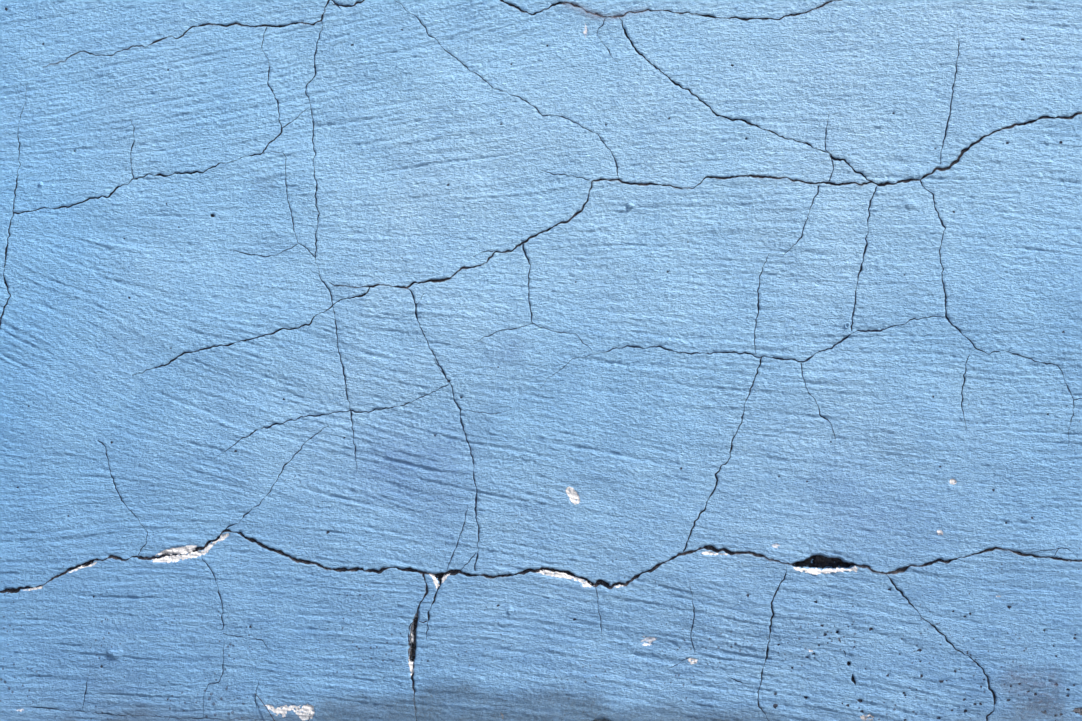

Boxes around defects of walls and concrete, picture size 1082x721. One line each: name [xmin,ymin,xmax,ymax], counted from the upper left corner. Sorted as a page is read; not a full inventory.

crack [0,0,364,325]
crack [143,0,1082,464]
crack [189,231,1004,721]
crack [0,440,181,593]
spalling [152,533,229,563]
spalling [429,573,450,588]
spalling [794,555,858,575]
crack [1011,548,1082,562]
spalling [408,610,419,675]
crack [33,675,159,717]
crack [172,647,278,721]